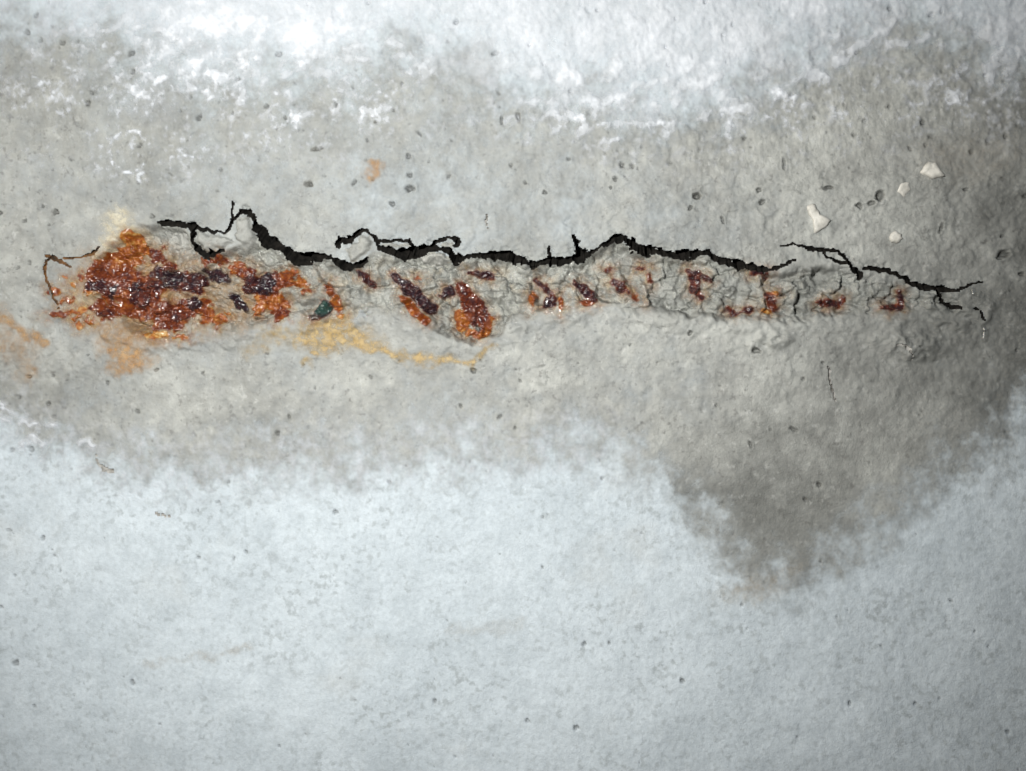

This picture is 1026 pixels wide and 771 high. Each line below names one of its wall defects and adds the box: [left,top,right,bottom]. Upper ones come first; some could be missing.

crack [157,201,986,321]
rust [46,210,495,365]
leakage [0,0,1026,585]
rust [528,278,564,311]
rust [572,279,598,307]
rust [604,267,638,301]
rust [685,268,712,301]
rust [723,270,779,317]
rust [815,296,846,309]
rust [880,290,904,311]